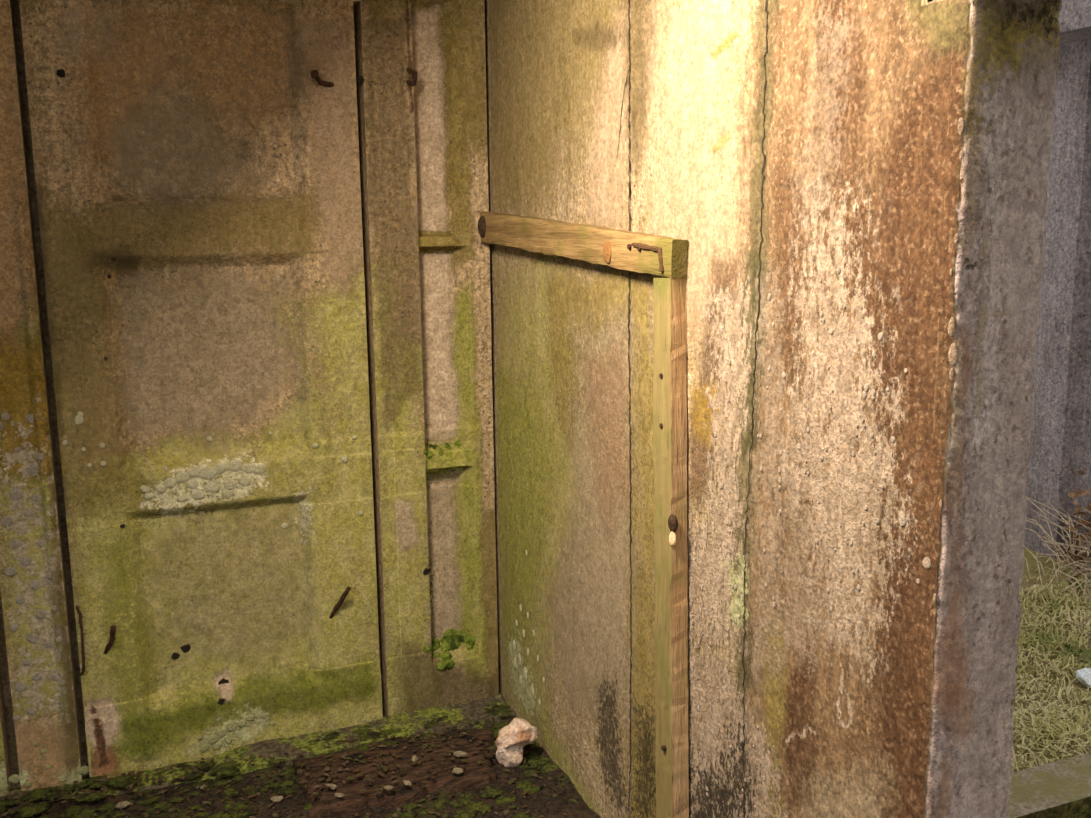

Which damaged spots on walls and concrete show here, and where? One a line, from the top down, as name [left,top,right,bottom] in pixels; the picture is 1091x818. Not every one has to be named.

water stain [0,204,337,547]
rust [91,707,119,777]
water stain [542,722,600,817]
water stain [596,671,656,818]